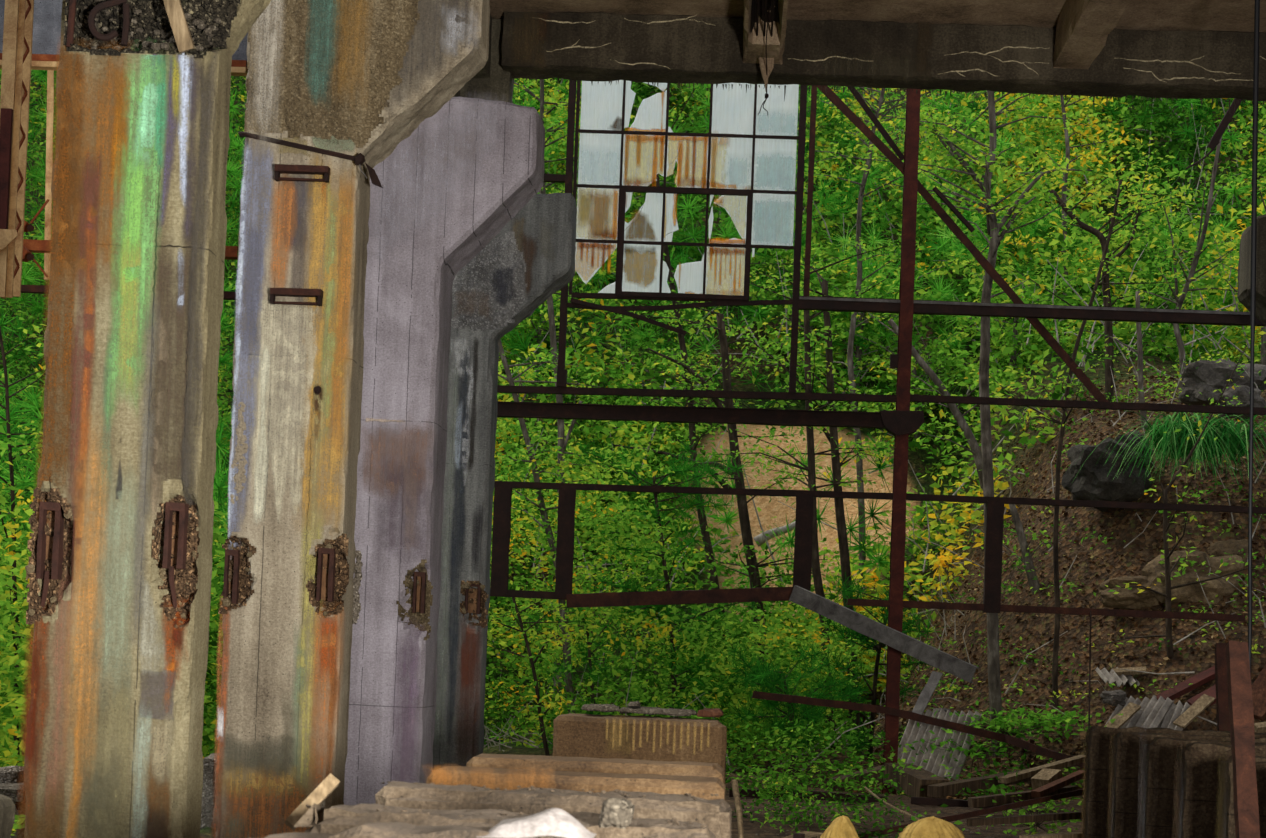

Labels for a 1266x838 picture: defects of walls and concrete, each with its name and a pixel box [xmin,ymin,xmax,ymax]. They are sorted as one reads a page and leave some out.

leakage [259,0,277,103]
leakage [309,0,363,98]
crack [940,46,1047,76]
crack [1121,56,1266,82]
corrosion [272,175,353,537]
corrosion [23,55,101,838]
leakage [82,53,214,838]
spalling [25,487,73,624]
spalling [152,495,200,628]
spalling [218,536,256,614]
spalling [306,534,363,624]
corrosion [164,603,190,702]